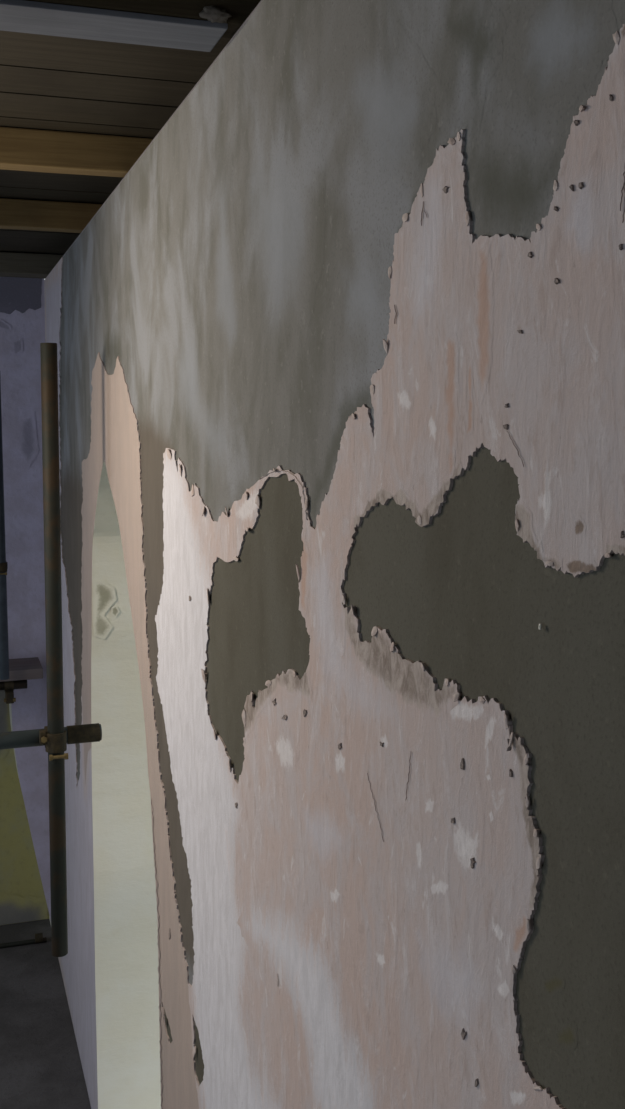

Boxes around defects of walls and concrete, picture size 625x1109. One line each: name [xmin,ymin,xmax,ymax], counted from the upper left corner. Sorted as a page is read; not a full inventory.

peeling [61,539,83,727]
peeling [59,743,98,1109]
water stain [100,314,125,375]
spalling [151,800,173,1108]
flaking render [45,0,475,526]
water stain [131,0,625,985]
flaking render [155,447,625,1109]
flaking render [479,0,621,139]
flaking render [553,180,584,192]